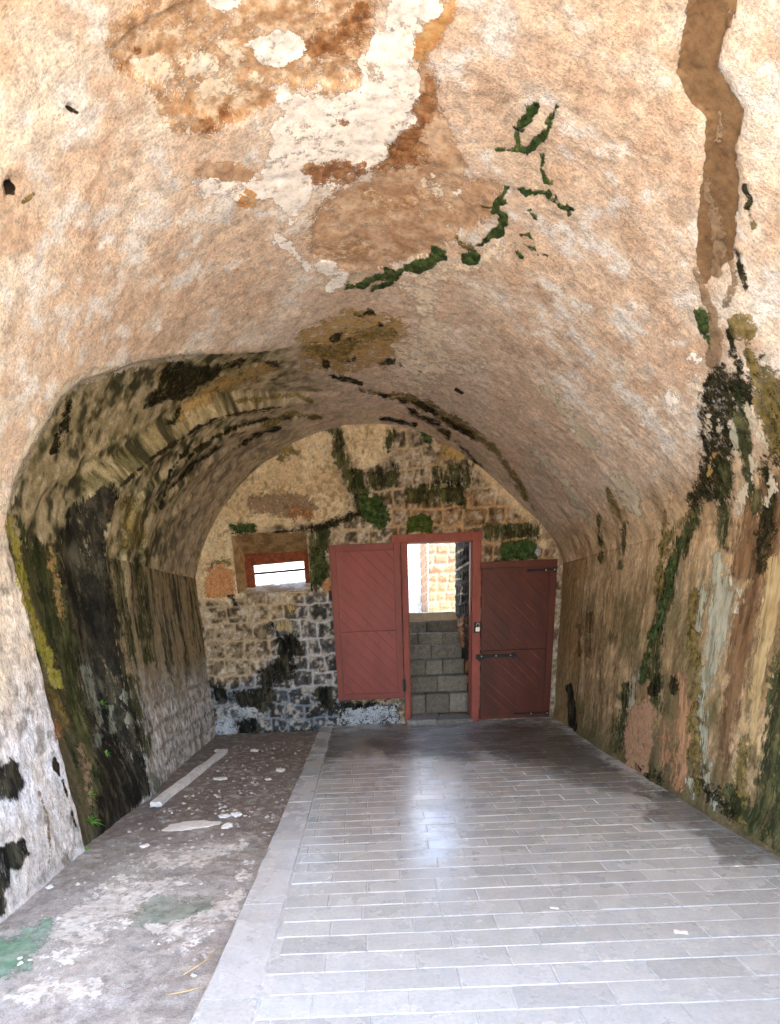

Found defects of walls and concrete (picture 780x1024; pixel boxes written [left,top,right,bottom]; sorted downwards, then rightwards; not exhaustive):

spalling [105,0,506,294]
leakage [634,0,780,842]
leakage [0,350,203,837]
leakage [212,604,316,735]
leakage [629,665,640,710]